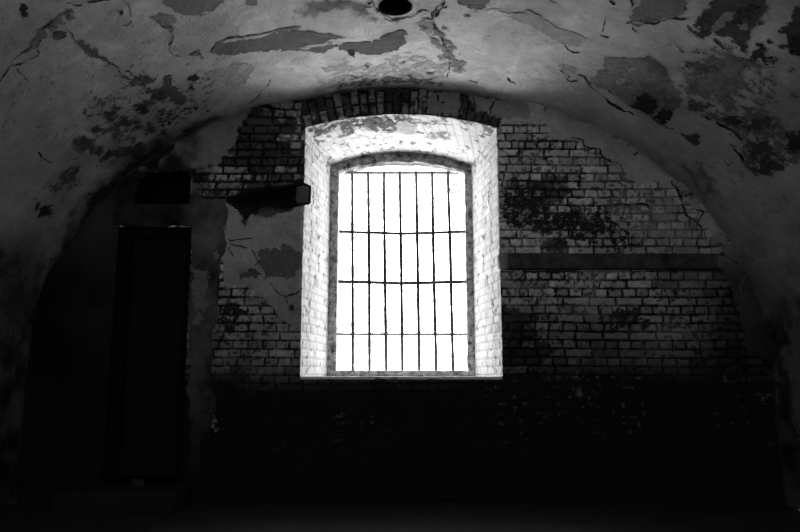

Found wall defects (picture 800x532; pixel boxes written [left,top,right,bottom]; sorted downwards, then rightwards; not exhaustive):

crack [0,0,203,82]
flaking render [163,0,224,16]
flaking render [28,26,458,221]
crack [365,0,495,119]
flaking render [589,0,800,177]
crack [671,179,707,240]
flaking render [239,243,302,280]